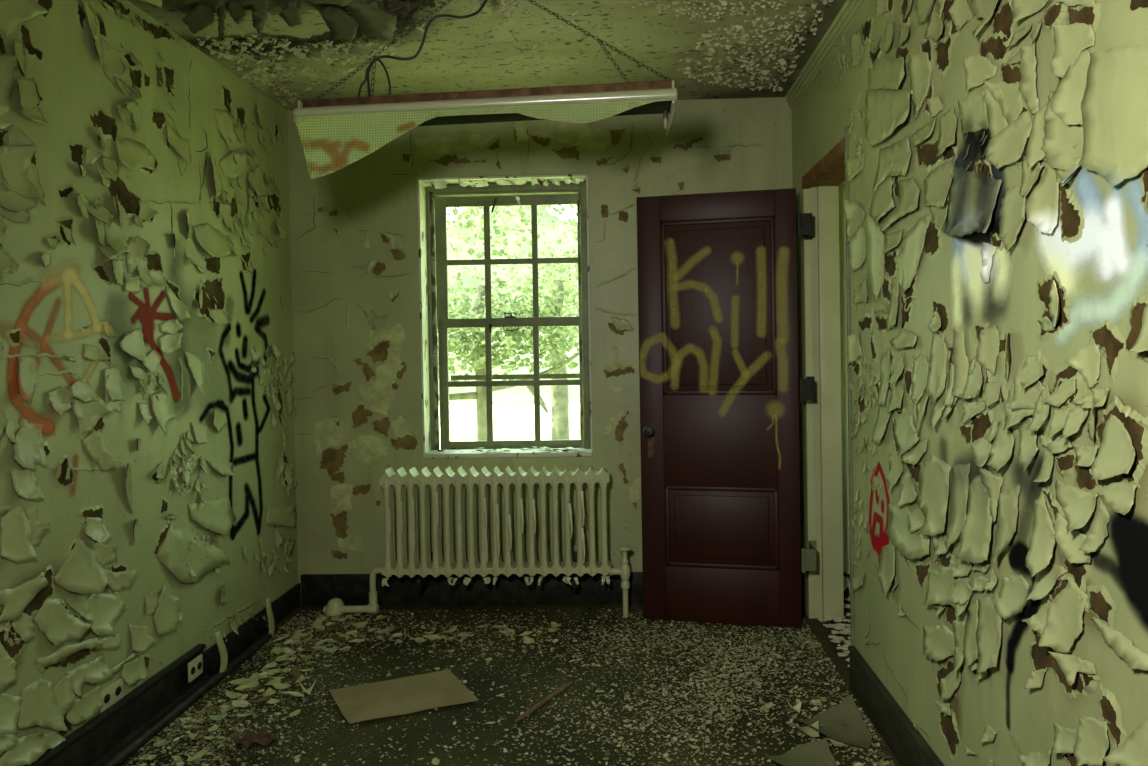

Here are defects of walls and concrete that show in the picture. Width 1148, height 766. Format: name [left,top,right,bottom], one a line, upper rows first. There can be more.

peeling [0,0,833,766]
peeling [843,0,1148,766]